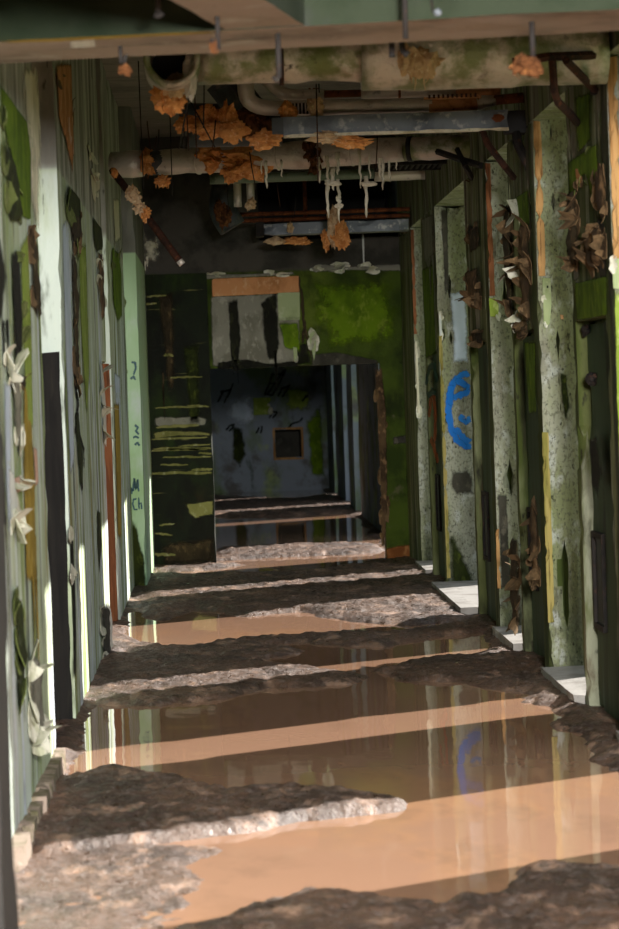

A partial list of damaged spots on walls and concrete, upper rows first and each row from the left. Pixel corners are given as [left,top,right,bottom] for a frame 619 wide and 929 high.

spalling [0,104,42,318]
spalling [467,329,483,348]
spalling [456,199,532,342]
spalling [556,163,619,289]
peeling [4,343,36,544]
water stain [218,294,390,547]
spalling [502,496,541,635]